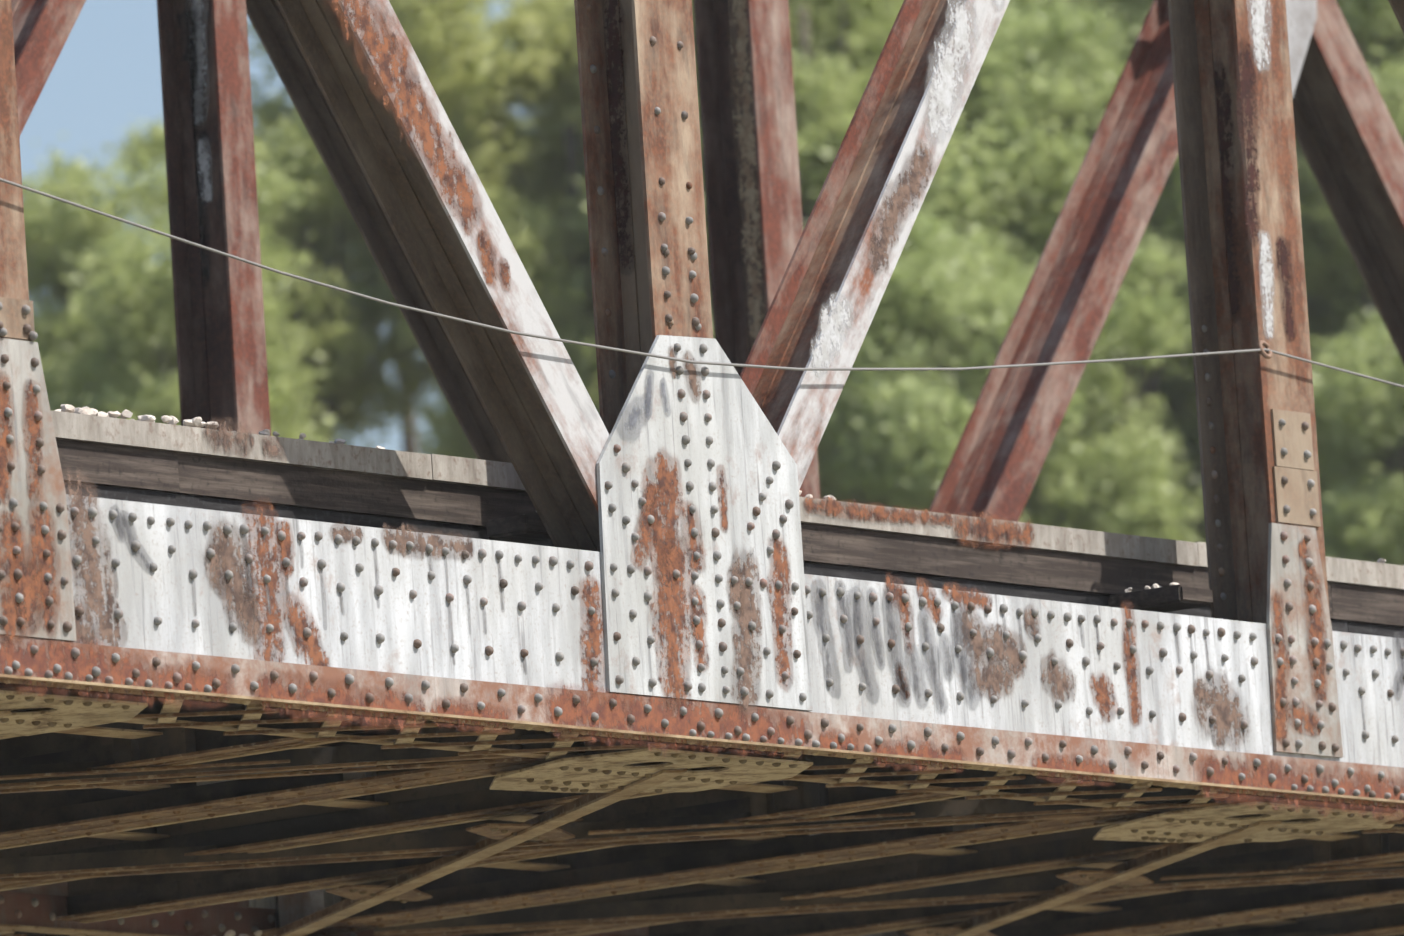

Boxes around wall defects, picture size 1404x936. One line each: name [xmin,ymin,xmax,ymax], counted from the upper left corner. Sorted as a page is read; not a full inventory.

rust [332,0,510,288]
rust [0,376,230,704]
rust [204,506,508,731]
rust [548,452,964,771]
rust [886,574,993,650]
leakage [815,585,1076,708]
rust [1091,605,1142,724]
rust [1272,540,1326,742]
leakage [1396,637,1404,693]
rust [1032,755,1114,784]
rust [1194,673,1404,817]